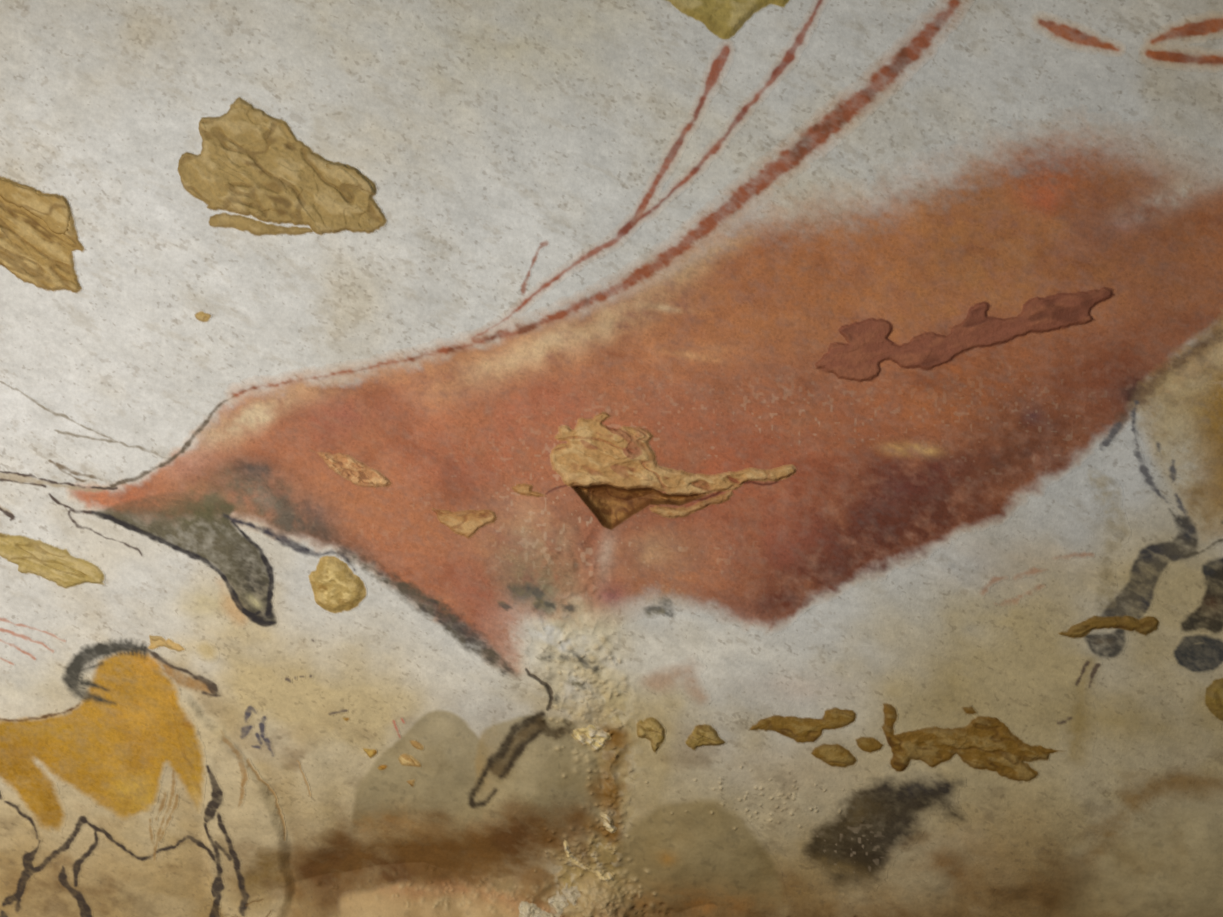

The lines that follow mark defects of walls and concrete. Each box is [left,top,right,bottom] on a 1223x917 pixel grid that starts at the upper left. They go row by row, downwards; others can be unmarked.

peeling [663,0,791,41]
peeling [177,96,388,237]
peeling [0,175,86,294]
peeling [549,410,797,531]
peeling [0,532,105,589]
peeling [308,555,367,614]
peeling [1058,614,1160,639]
water stain [570,724,612,753]
peeling [749,702,1066,783]
water stain [600,813,618,834]
water stain [563,839,614,882]
water stain [518,882,581,917]